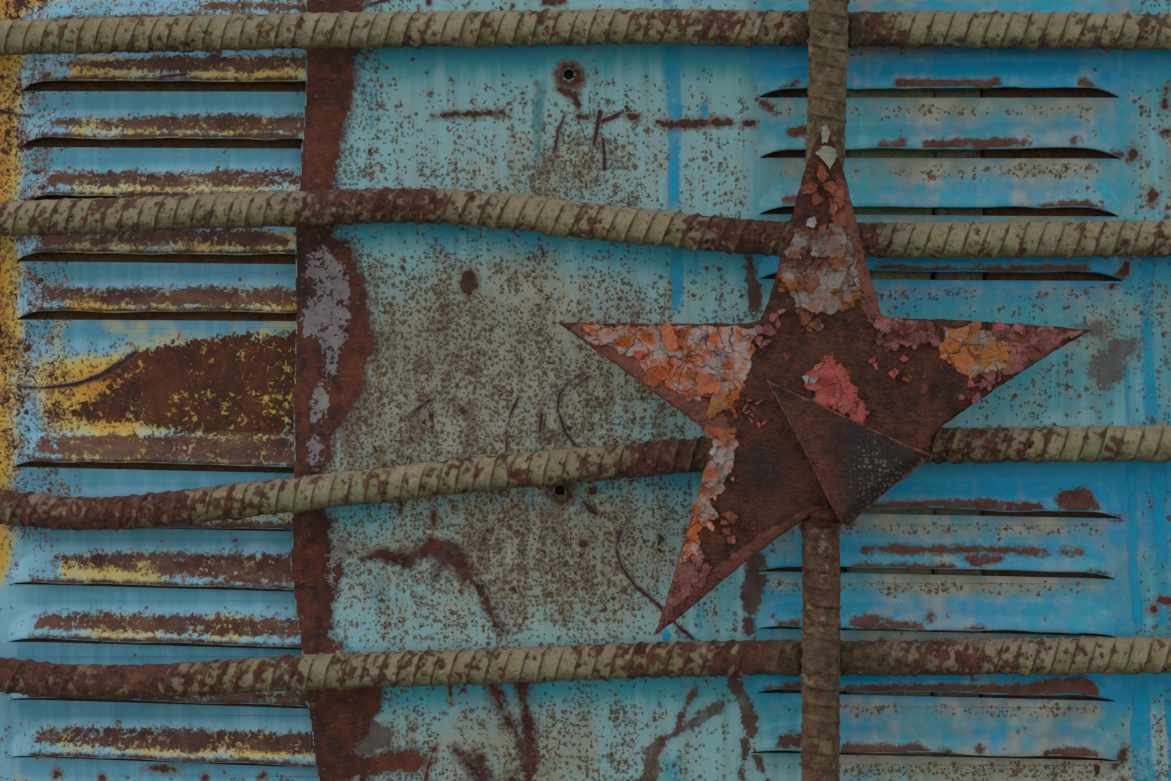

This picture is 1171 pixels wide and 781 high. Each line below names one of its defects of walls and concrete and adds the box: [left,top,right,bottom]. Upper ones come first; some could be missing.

rust [40,48,360,196]
rust [16,224,378,478]
peeling [581,124,870,625]
peeling [869,315,1084,405]
rust [869,487,1123,522]
rust [31,508,350,655]
rust [738,552,768,636]
rust [855,542,1084,568]
rust [29,687,437,781]
rust [452,682,539,781]
rust [621,677,769,781]
rust [844,676,1100,696]